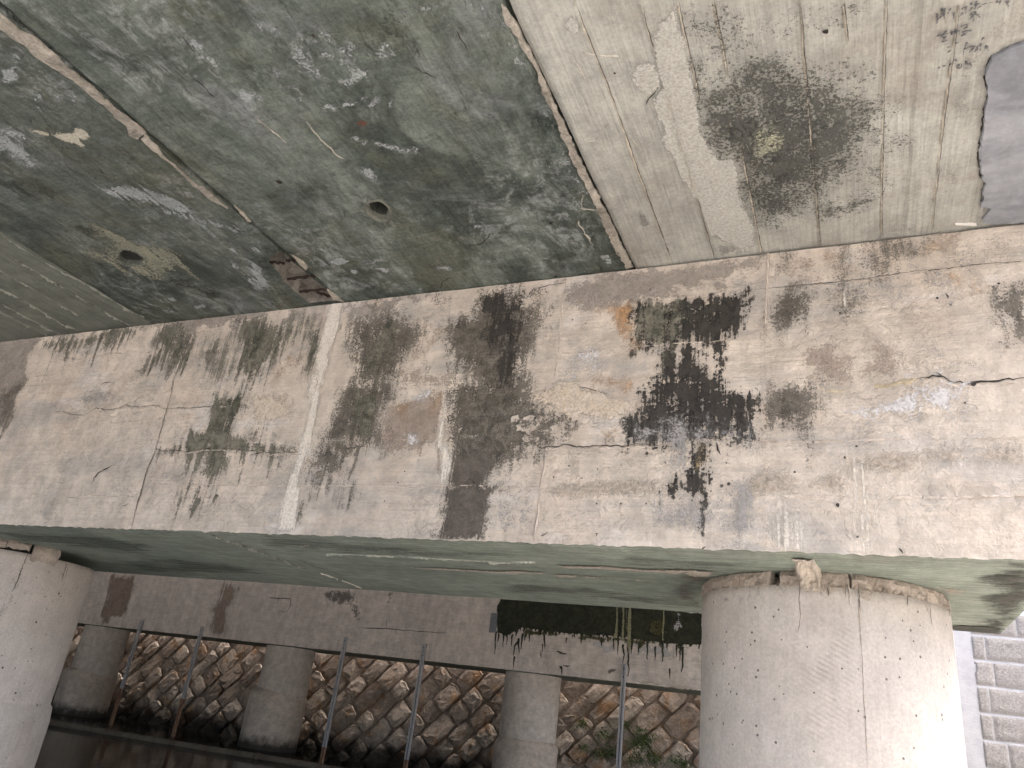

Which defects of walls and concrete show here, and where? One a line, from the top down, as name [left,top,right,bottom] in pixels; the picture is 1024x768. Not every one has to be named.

damp [631,3,915,254]
spalling [268,251,334,303]
damp [833,229,938,307]
crack [56,336,298,528]
damp [204,395,241,450]
damp [234,324,282,381]
damp [264,283,578,557]
damp [619,252,826,551]
crack [922,372,1024,388]
damp [494,558,738,677]
crack [827,583,868,762]